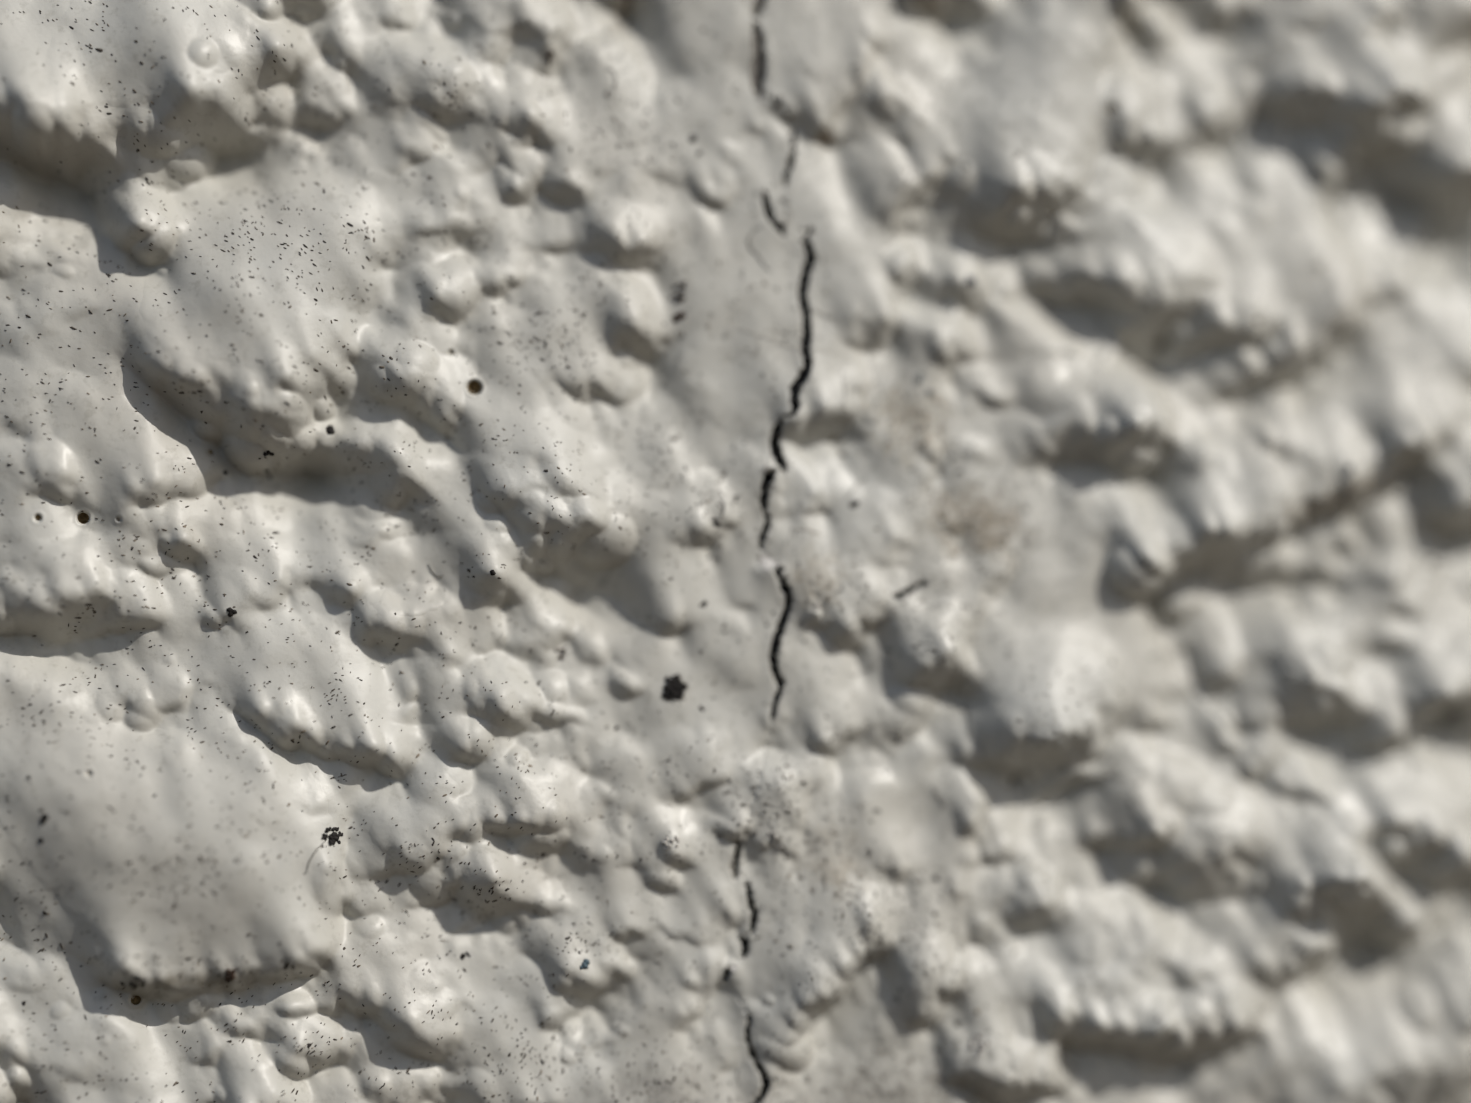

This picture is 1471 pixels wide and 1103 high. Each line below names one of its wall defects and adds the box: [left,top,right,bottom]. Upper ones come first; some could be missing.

crack [749,0,815,720]
crack [722,840,758,980]
crack [744,1015,770,1103]